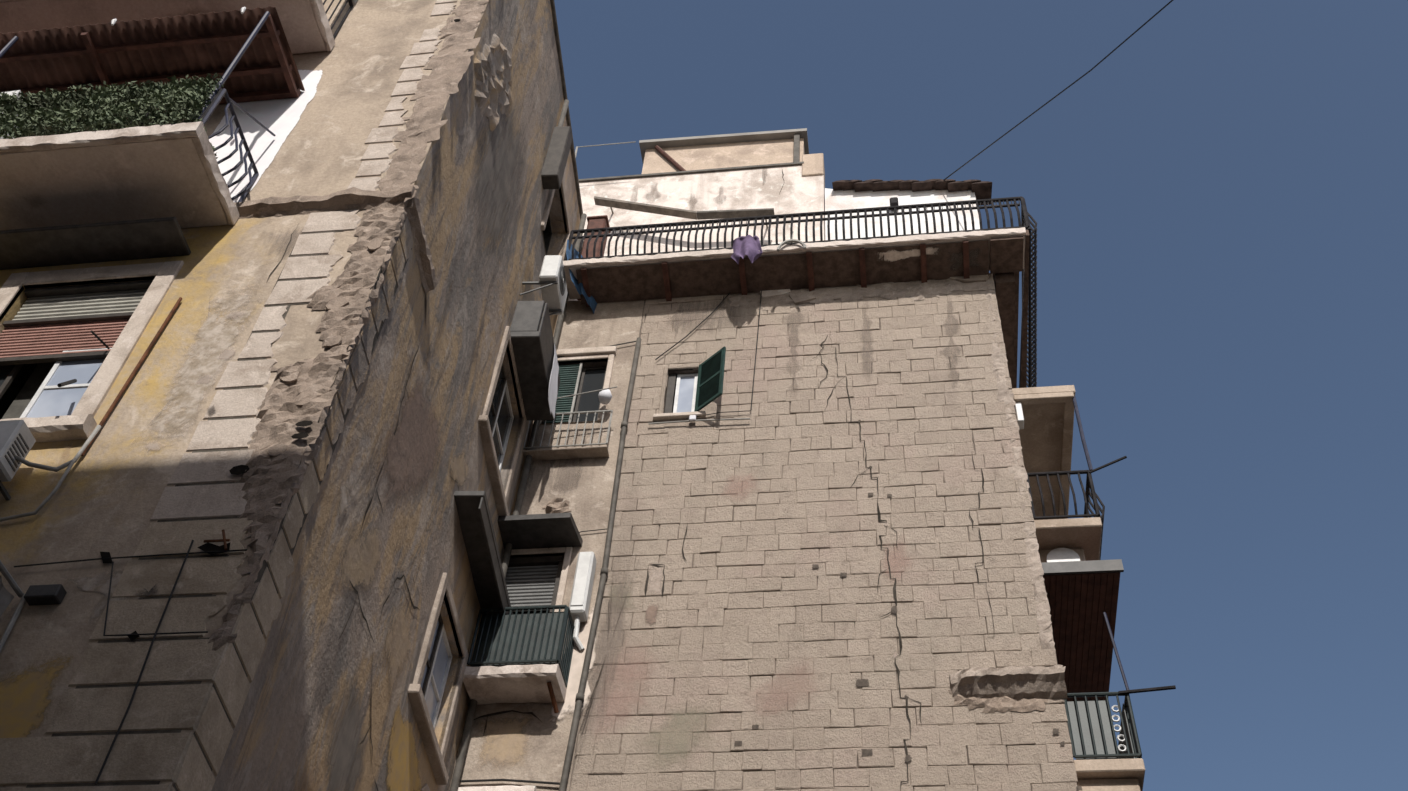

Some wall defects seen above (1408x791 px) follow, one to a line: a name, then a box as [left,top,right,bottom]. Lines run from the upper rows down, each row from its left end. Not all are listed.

spalling [377,0,489,191]
spalling [197,207,407,651]
crack [814,331,922,791]